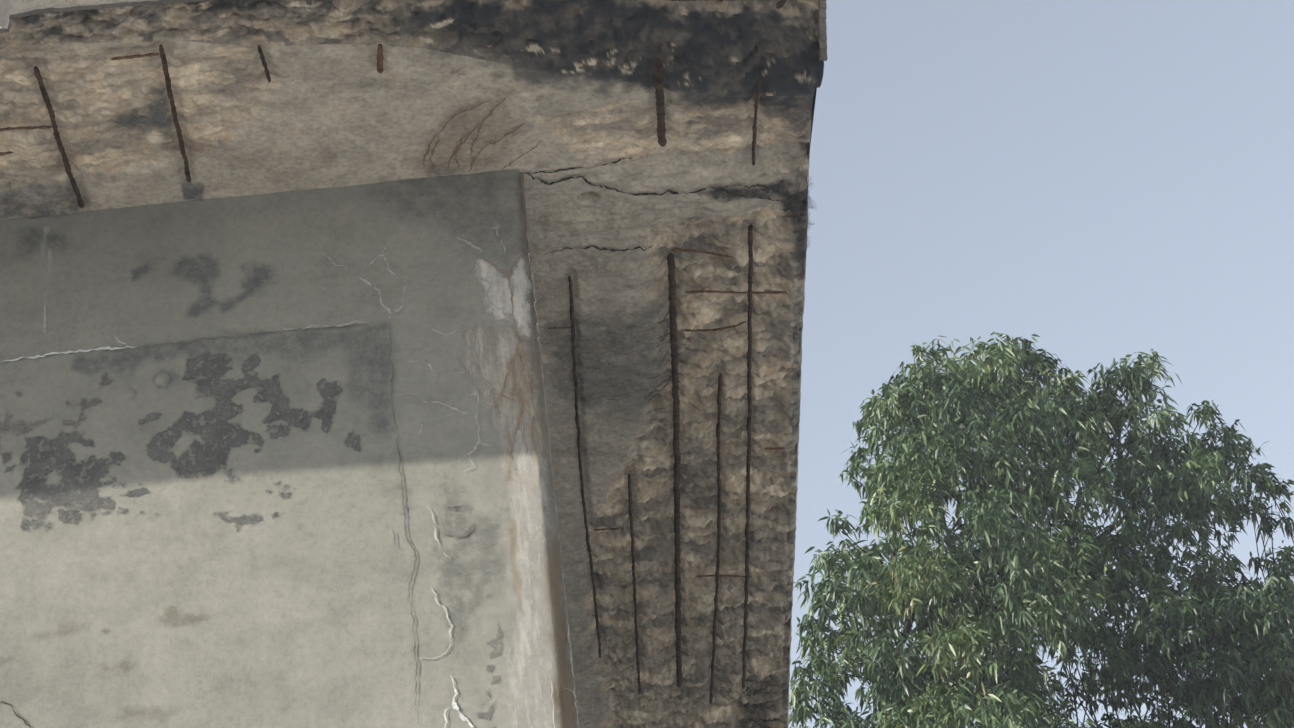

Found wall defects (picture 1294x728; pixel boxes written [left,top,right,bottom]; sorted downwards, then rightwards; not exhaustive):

crack [0,224,651,728]
spalling [0,0,824,728]
crack [502,157,793,202]